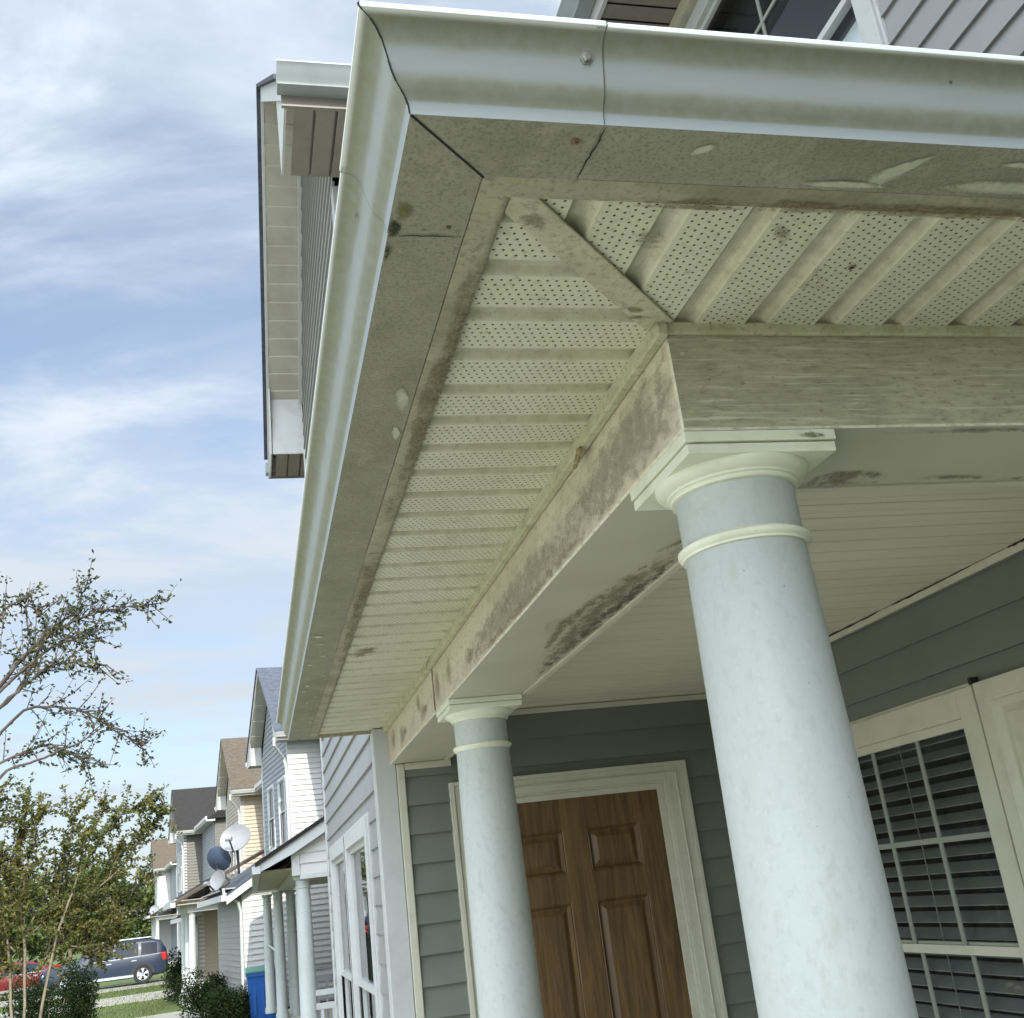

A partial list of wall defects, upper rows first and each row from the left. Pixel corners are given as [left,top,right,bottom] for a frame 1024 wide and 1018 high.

crack [577,129,605,178]
peeling [806,157,931,188]
peeling [957,181,1024,194]
water stain [385,204,412,258]
crack [398,232,462,240]
peeling [396,389,409,410]
water stain [471,374,670,661]
water stain [543,541,682,672]